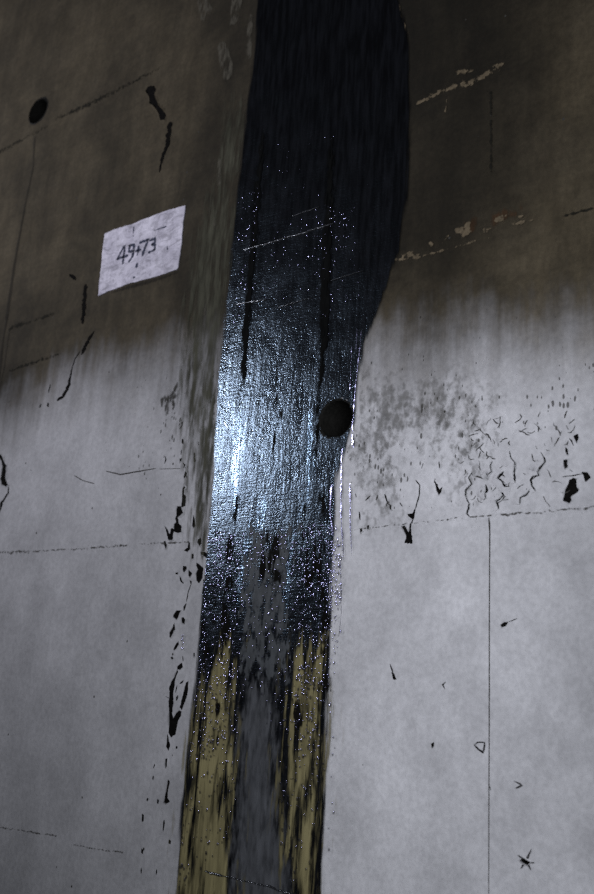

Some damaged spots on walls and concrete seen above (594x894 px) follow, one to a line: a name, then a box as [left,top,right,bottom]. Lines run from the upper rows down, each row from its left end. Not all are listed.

crack [145,86,172,172]
crack [39,274,94,408]
crack [0,451,10,511]
water stain [160,0,504,894]
spalling [365,481,420,544]
peeling [457,411,591,526]
spalling [152,439,207,779]